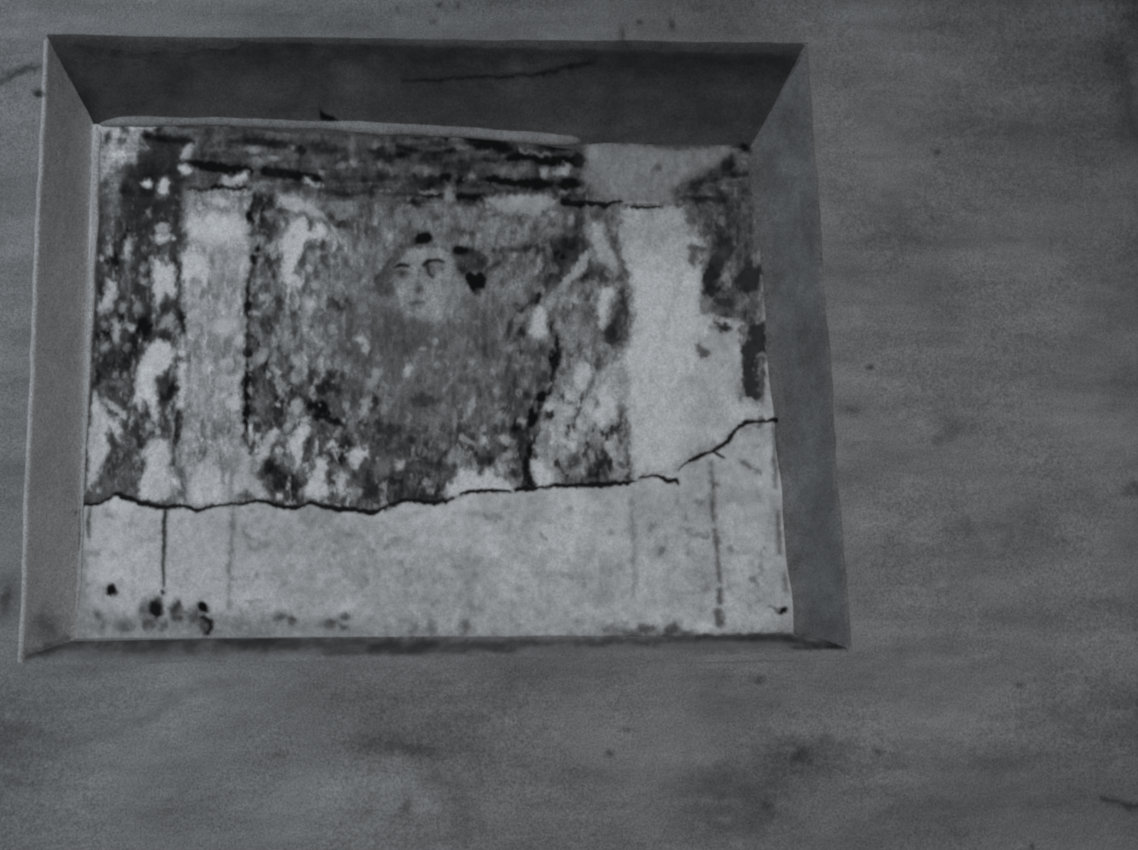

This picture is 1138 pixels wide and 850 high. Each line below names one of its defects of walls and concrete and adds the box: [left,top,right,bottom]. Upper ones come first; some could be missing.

peeling [414,165,431,176]
peeling [420,186,455,229]
peeling [494,147,570,178]
peeling [87,136,405,506]
peeling [478,186,769,487]
peeling [403,338,483,417]
peeling [446,423,516,497]
crack [80,417,779,594]
spalling [139,597,209,634]
crack [715,589,723,626]